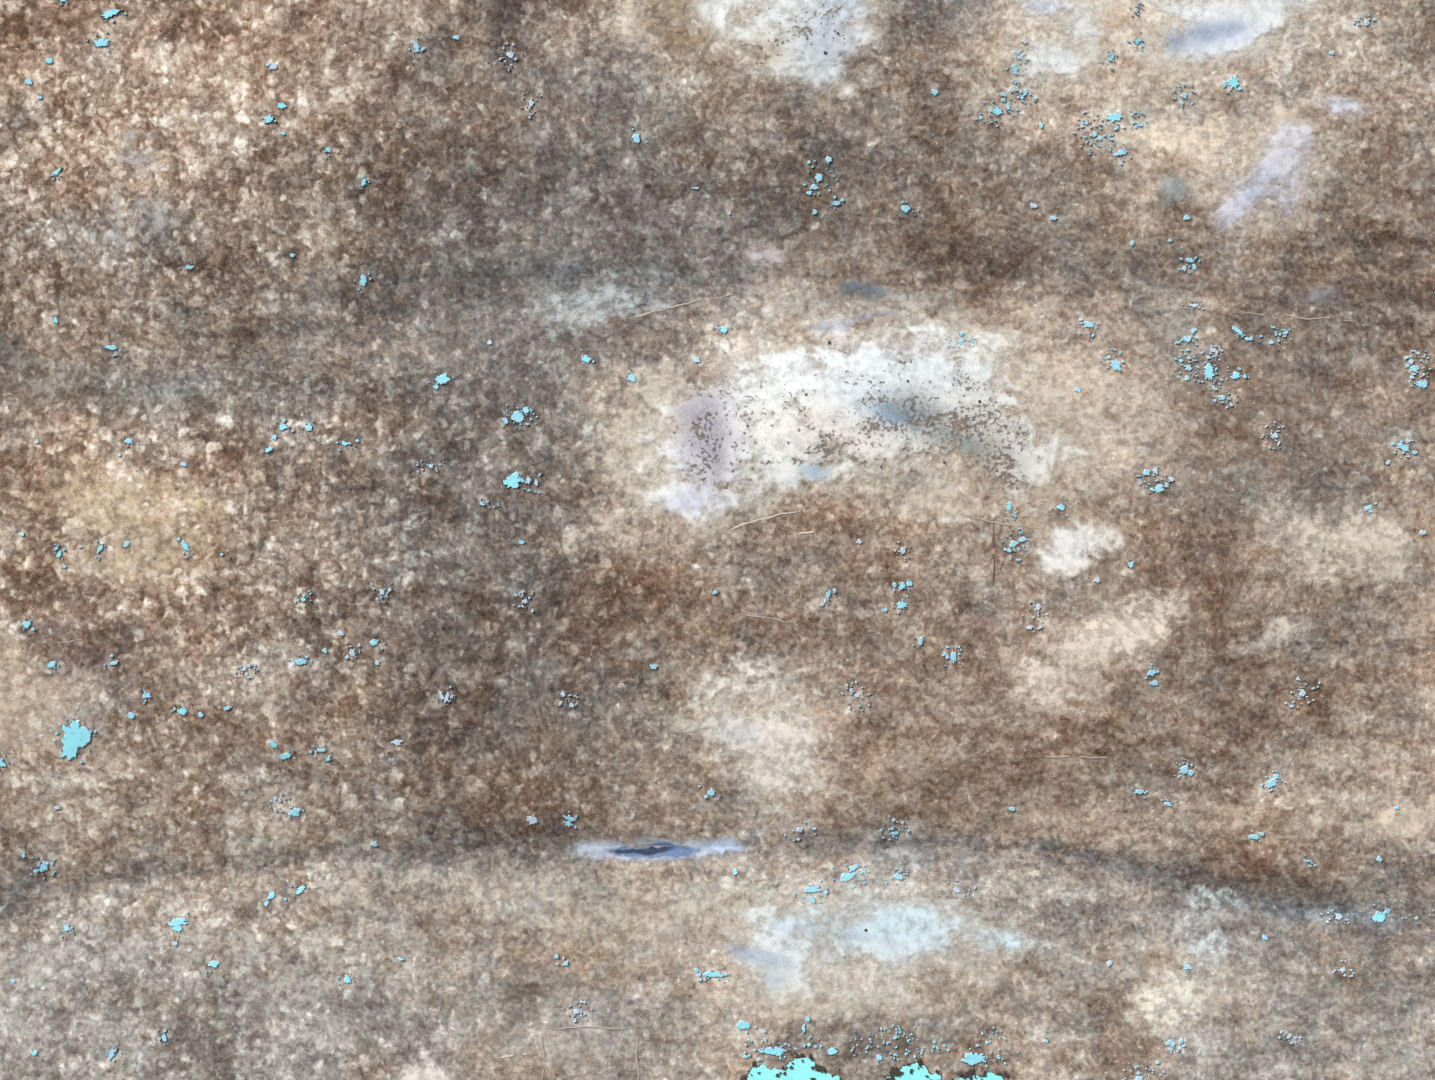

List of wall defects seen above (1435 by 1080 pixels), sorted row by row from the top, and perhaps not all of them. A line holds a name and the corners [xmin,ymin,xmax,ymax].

peeling [761,1046,787,1056]
peeling [961,1053,986,1066]